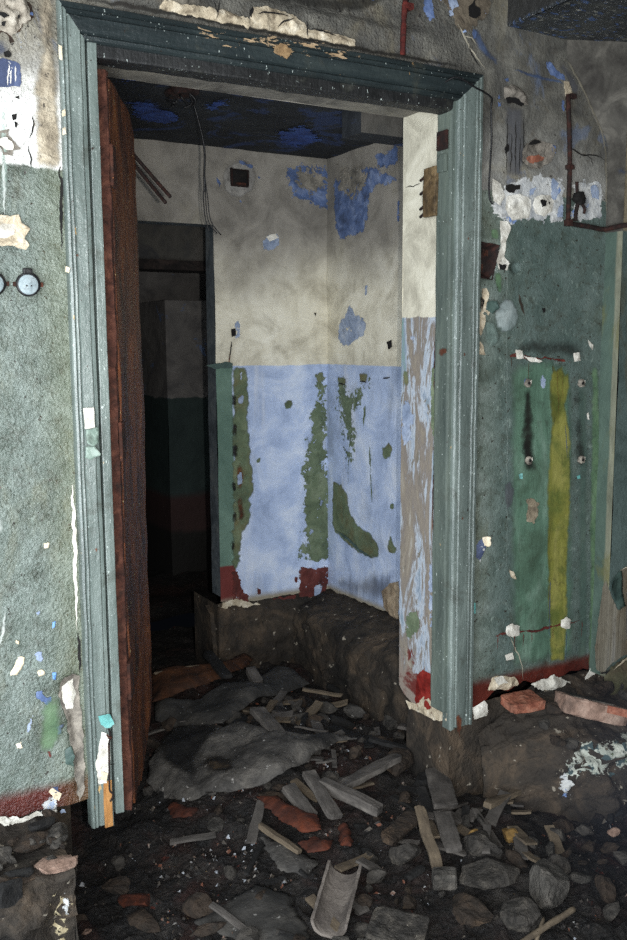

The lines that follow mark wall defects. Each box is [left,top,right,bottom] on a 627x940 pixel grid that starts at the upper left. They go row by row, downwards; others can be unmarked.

flaking render [0,0,34,99]
flaking render [159,0,360,59]
flaking render [0,215,30,250]
peeling [286,146,398,239]
peeling [479,137,603,355]
peeling [338,305,366,346]
peeling [207,362,261,609]
peeling [273,372,396,600]
flaking render [382,565,432,639]
peeling [585,567,627,695]
flaking render [531,674,570,691]
peeling [559,733,627,797]